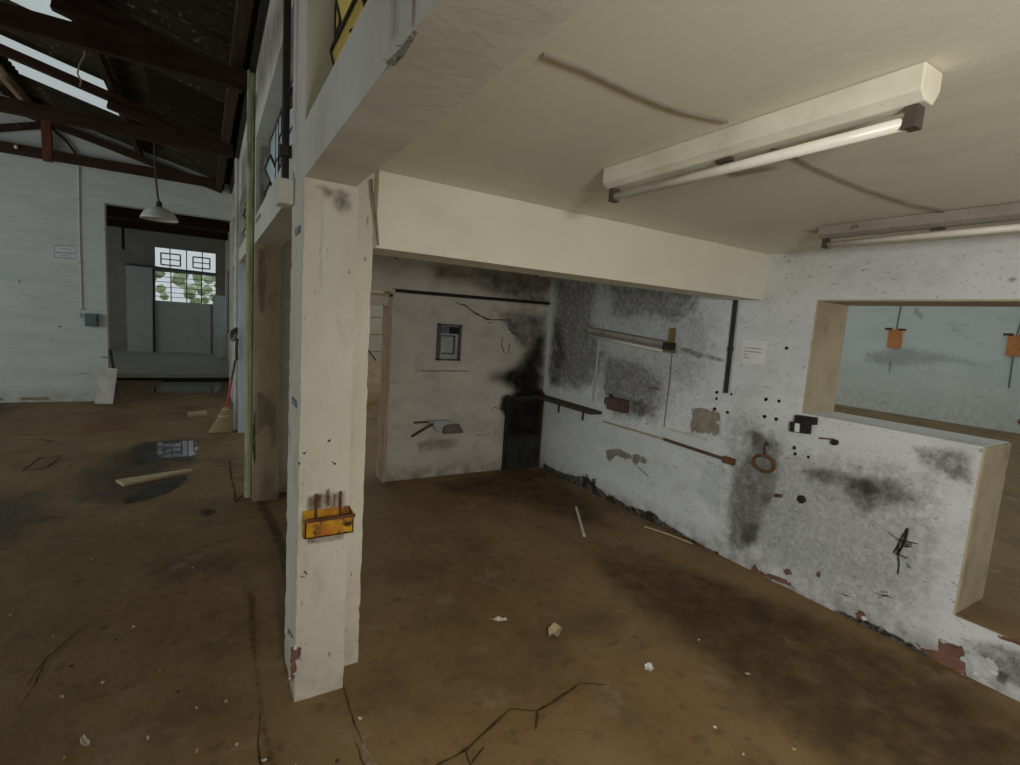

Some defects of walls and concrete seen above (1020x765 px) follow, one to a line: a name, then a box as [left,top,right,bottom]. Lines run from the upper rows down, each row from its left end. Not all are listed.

damp [732,435,774,545]
crack [17,624,88,711]
spalling [284,629,302,682]
spalling [916,639,999,678]
crack [256,713,264,765]
crack [343,686,365,765]
crack [436,682,606,765]